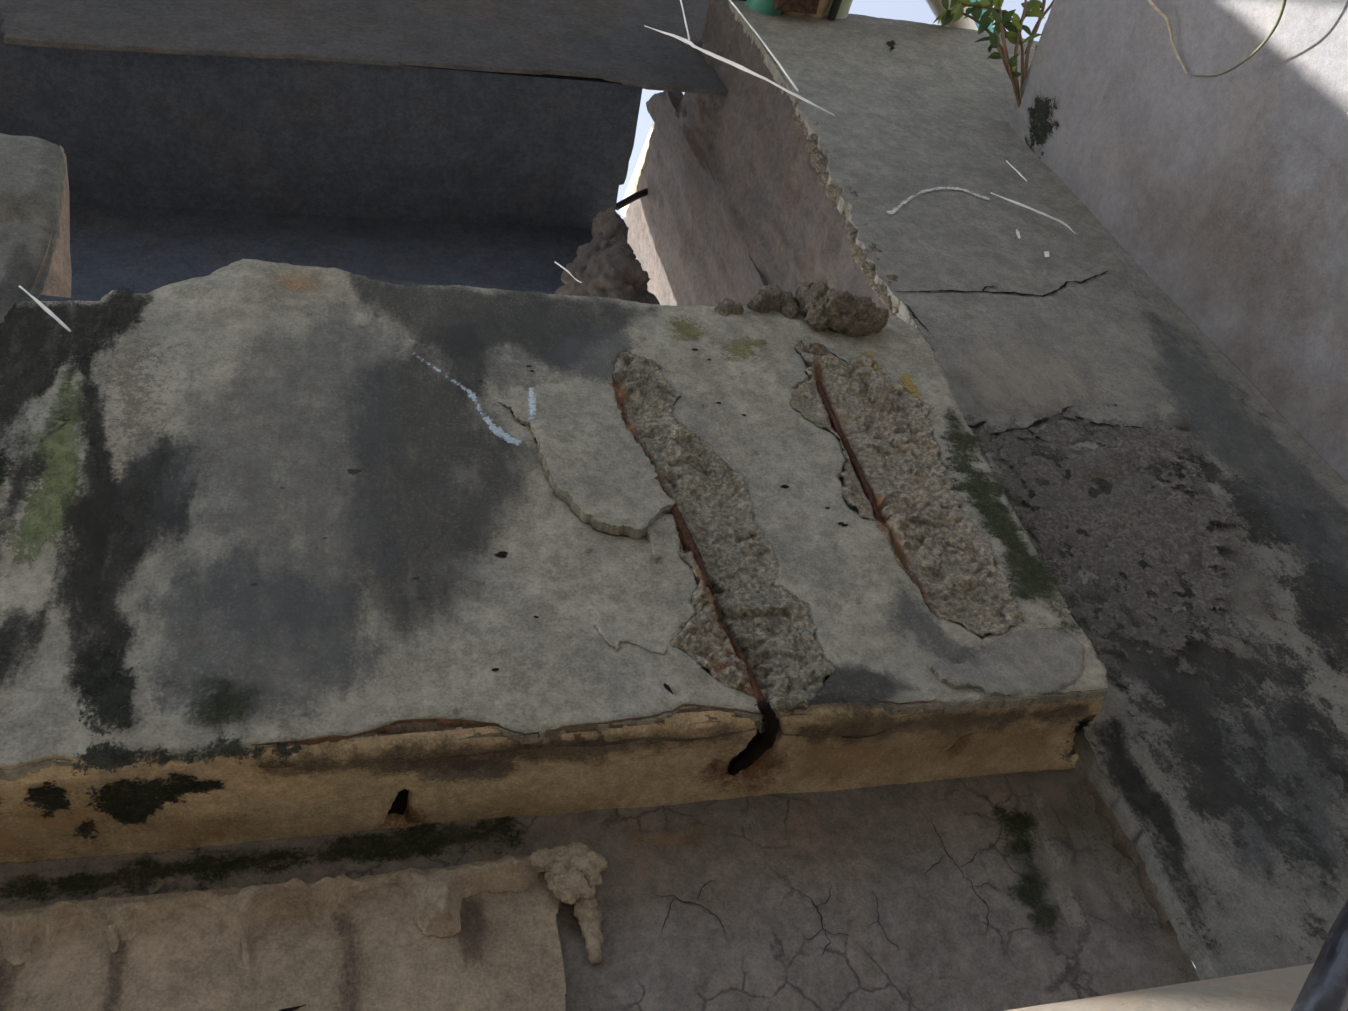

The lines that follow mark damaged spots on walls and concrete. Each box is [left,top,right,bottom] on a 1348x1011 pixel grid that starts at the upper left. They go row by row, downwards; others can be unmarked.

leakage [1025,95,1060,159]
flaking render [792,96,903,315]
crack [895,271,1108,331]
spalling [251,351,846,775]
leakage [0,255,649,1011]
corrosion [702,702,786,789]
crack [657,880,725,933]
crack [802,886,899,955]
crack [925,816,997,938]
leakage [1026,790,1087,931]
leakage [1066,714,1202,923]